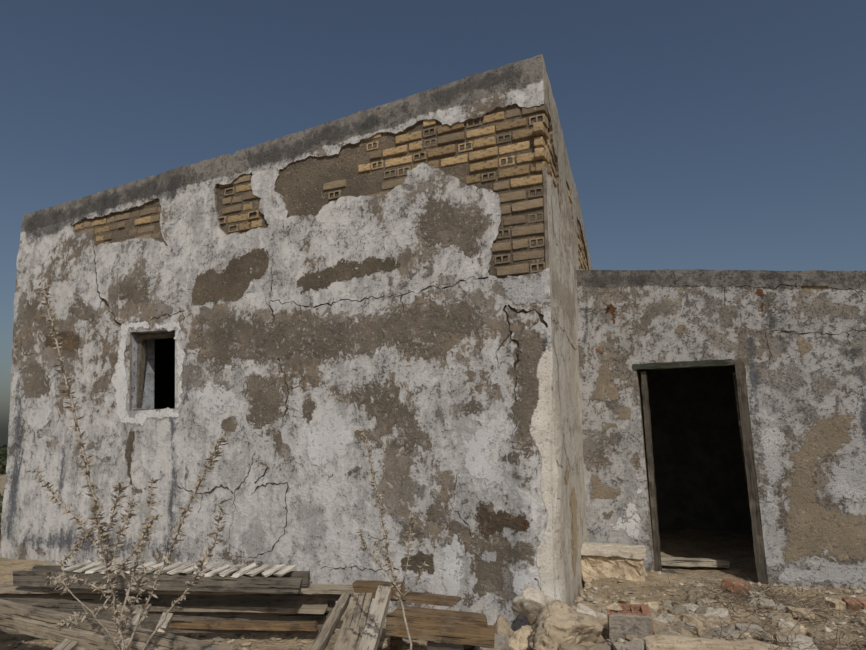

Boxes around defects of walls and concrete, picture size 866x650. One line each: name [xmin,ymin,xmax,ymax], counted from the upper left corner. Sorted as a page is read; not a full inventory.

spalling [74,199,168,246]
spalling [217,174,269,235]
spalling [275,103,576,326]
spalling [572,221,588,270]
crack [256,249,488,416]
crack [496,305,576,433]